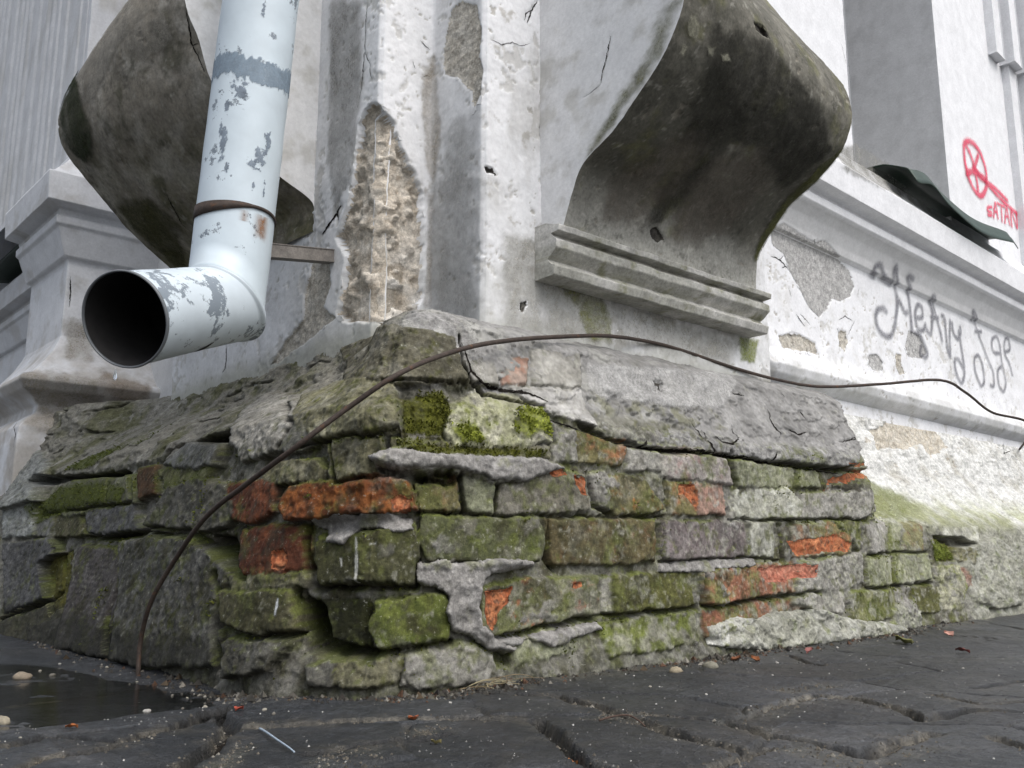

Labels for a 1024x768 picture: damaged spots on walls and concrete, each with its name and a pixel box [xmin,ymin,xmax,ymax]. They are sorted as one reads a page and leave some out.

spalling [443,0,483,115]
crack [493,2,537,46]
crack [322,206,341,234]
spalling [269,102,427,364]
peeling [771,223,854,316]
spalling [779,330,818,355]
crack [462,344,838,474]